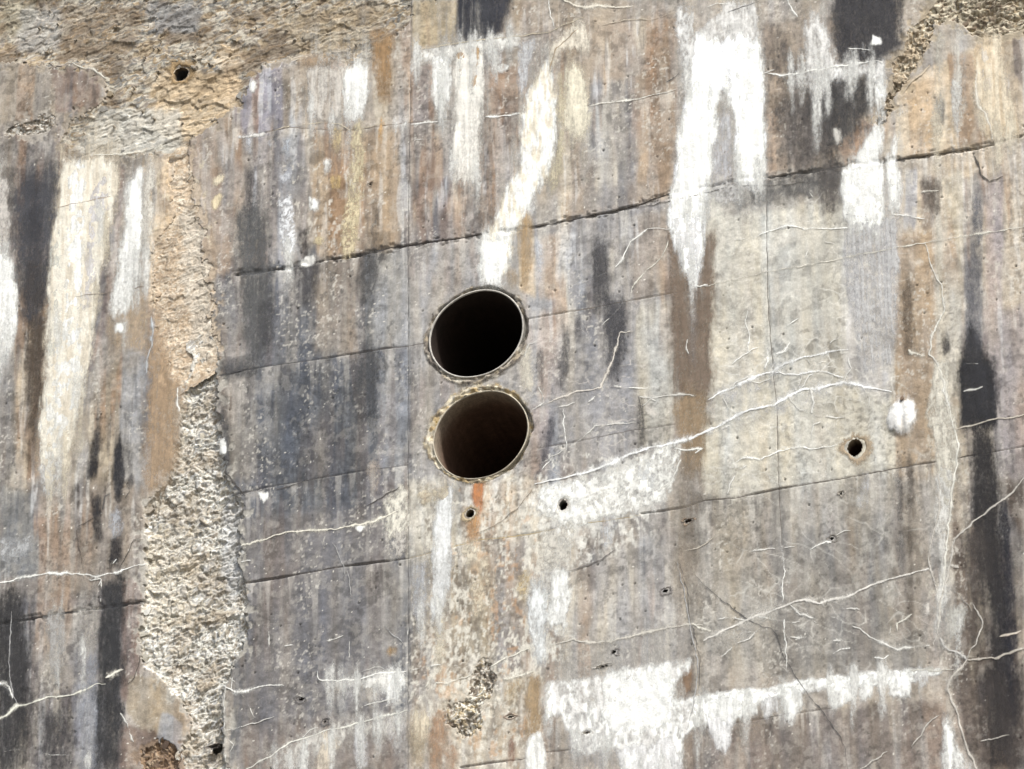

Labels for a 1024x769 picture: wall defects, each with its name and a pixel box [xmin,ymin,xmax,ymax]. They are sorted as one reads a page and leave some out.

crack [0,612,140,719]
water stain [0,129,155,501]
spalling [0,0,414,769]
spalling [442,657,497,739]
corrosion [468,482,483,536]
efflorescence [410,23,590,290]
crack [223,182,1024,769]
efflorescence [667,0,767,304]
water stain [517,444,941,769]
water stain [787,4,903,371]
spalling [877,0,1024,126]
efflorescence [942,718,965,769]